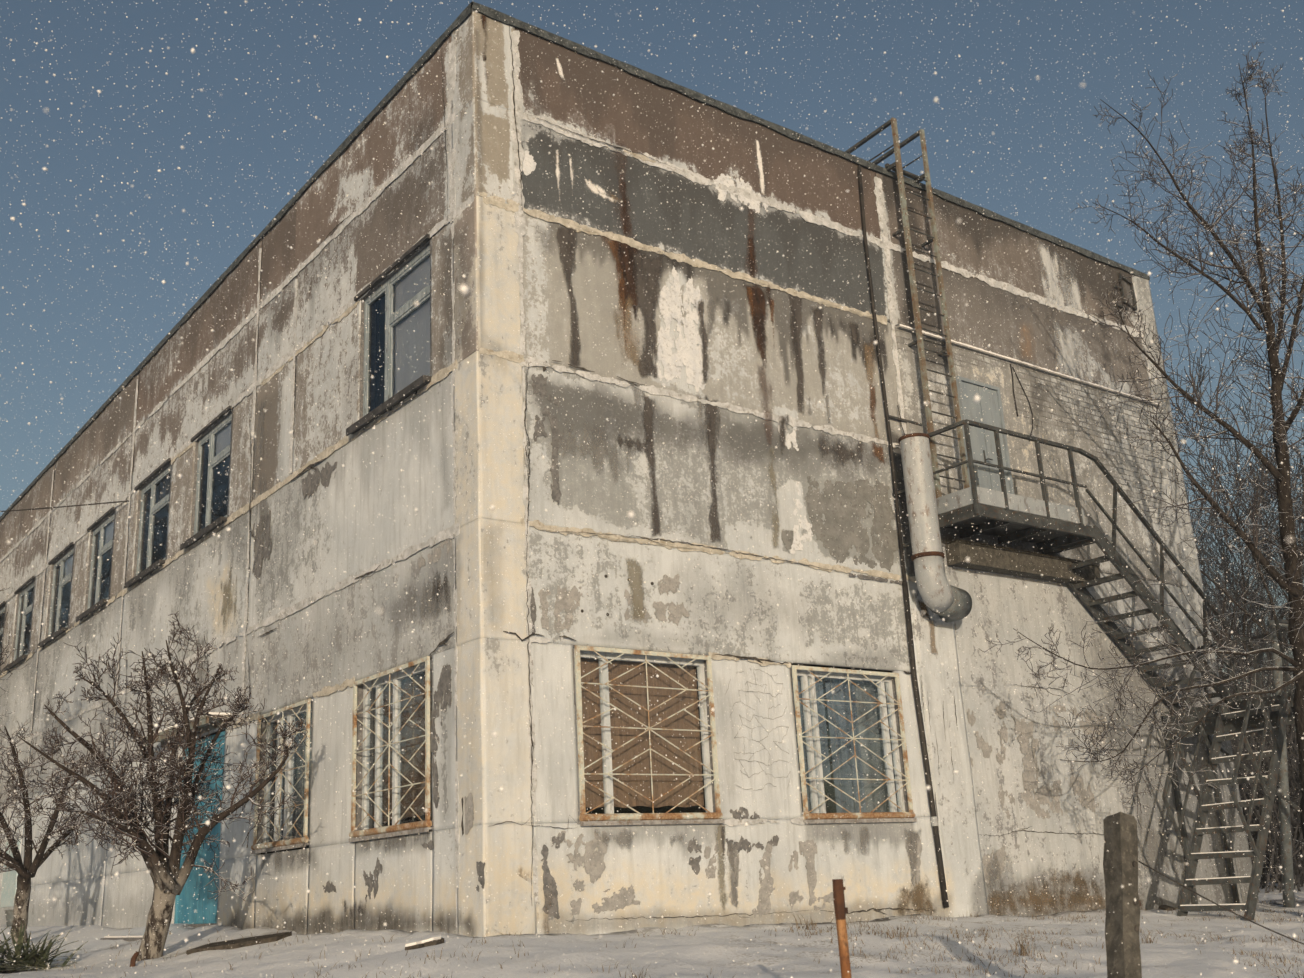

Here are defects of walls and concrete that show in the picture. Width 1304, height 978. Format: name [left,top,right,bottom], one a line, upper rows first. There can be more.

leakage [557,227,581,367]
rust [603,182,640,368]
rust [743,238,774,360]
leakage [561,253,662,536]
leakage [698,300,721,542]
leakage [779,294,830,454]
crack [461,360,849,901]
peeling [431,665,452,808]
peeling [967,701,1108,820]
peeling [363,857,383,900]
peeling [541,831,640,919]
peeling [687,835,834,918]